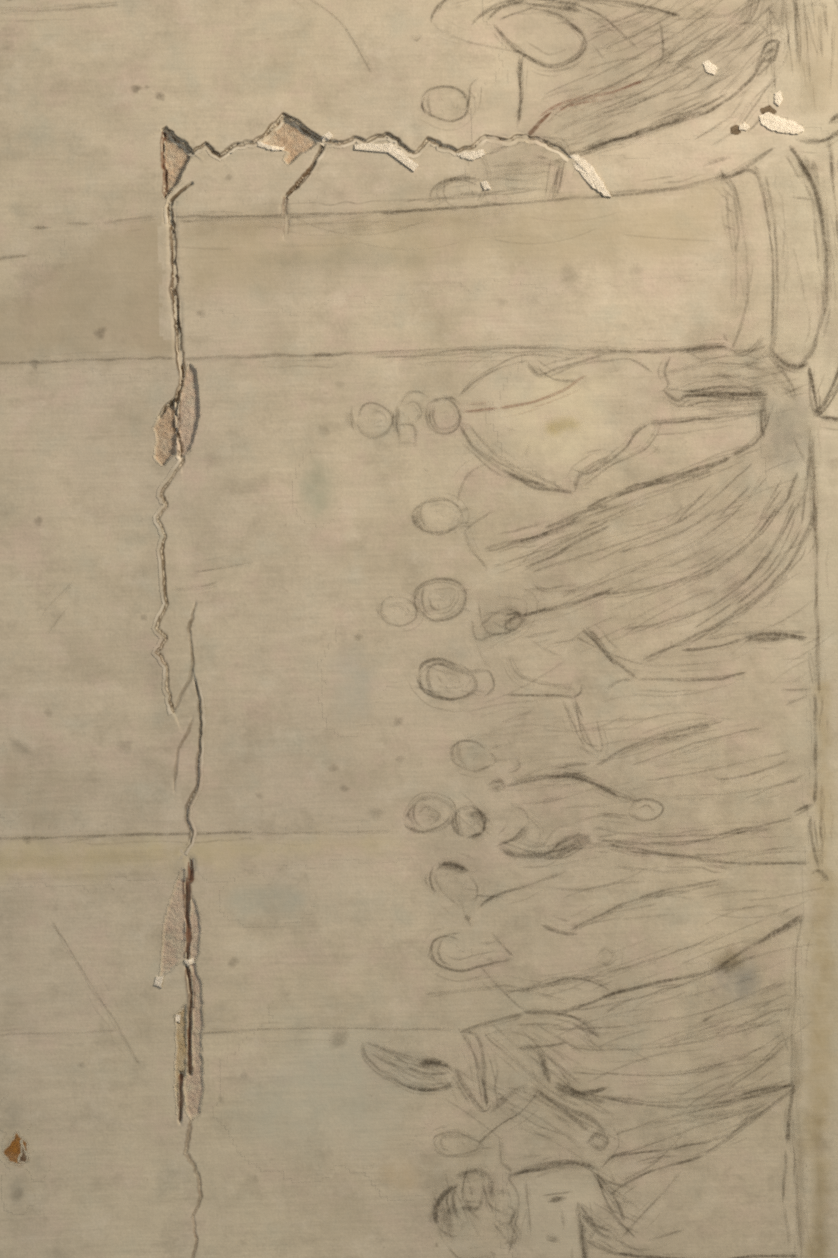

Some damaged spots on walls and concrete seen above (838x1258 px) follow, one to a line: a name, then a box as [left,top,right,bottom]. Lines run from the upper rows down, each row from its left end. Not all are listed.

flaking render [162,131,195,199]
flaking render [261,115,321,166]
flaking render [731,91,805,135]
flaking render [152,364,202,467]
crack [151,112,611,1108]
flaking render [159,868,205,1120]
corrosion [0,1094,50,1214]